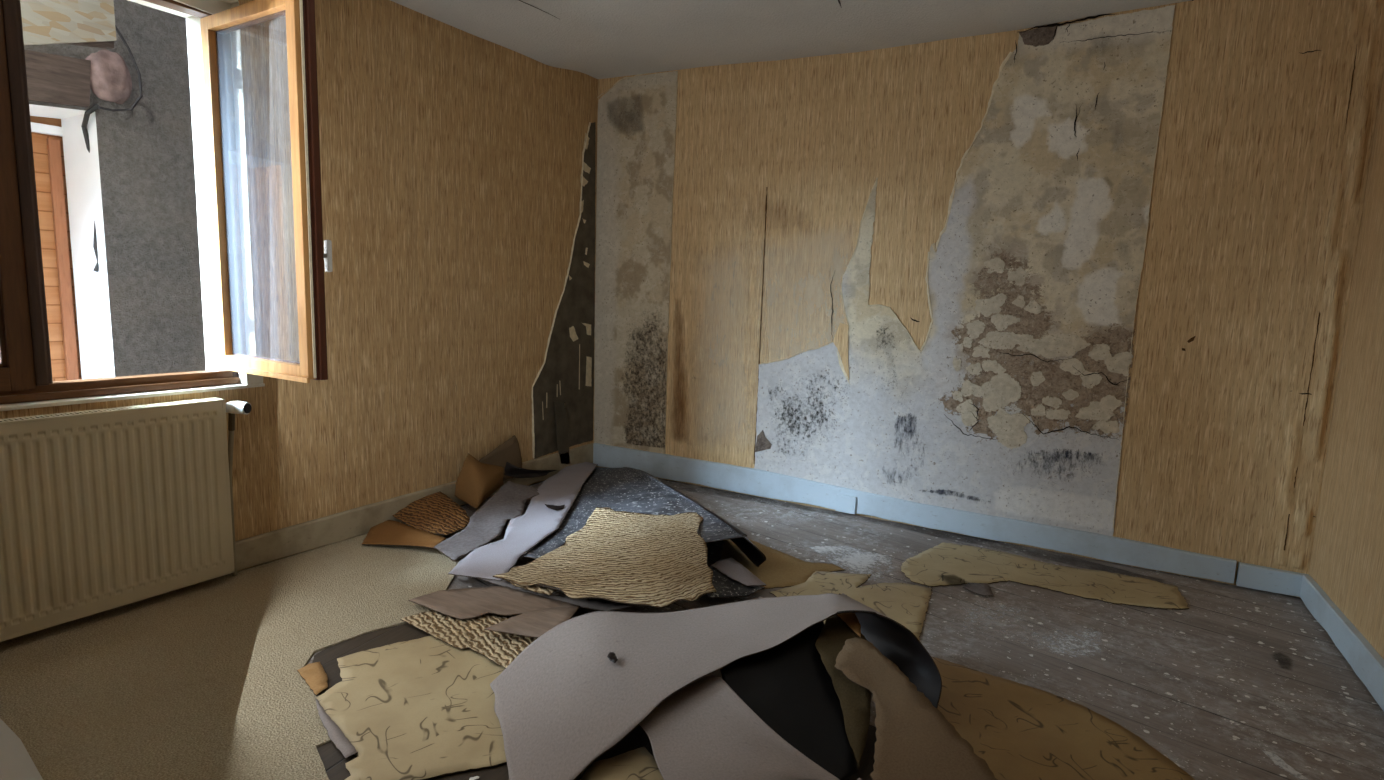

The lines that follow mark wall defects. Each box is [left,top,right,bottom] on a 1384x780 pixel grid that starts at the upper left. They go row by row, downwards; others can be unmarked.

flaking render [754,5,1175,536]
water stain [622,316,684,448]
water stain [895,413,924,450]
water stain [1019,450,1097,478]